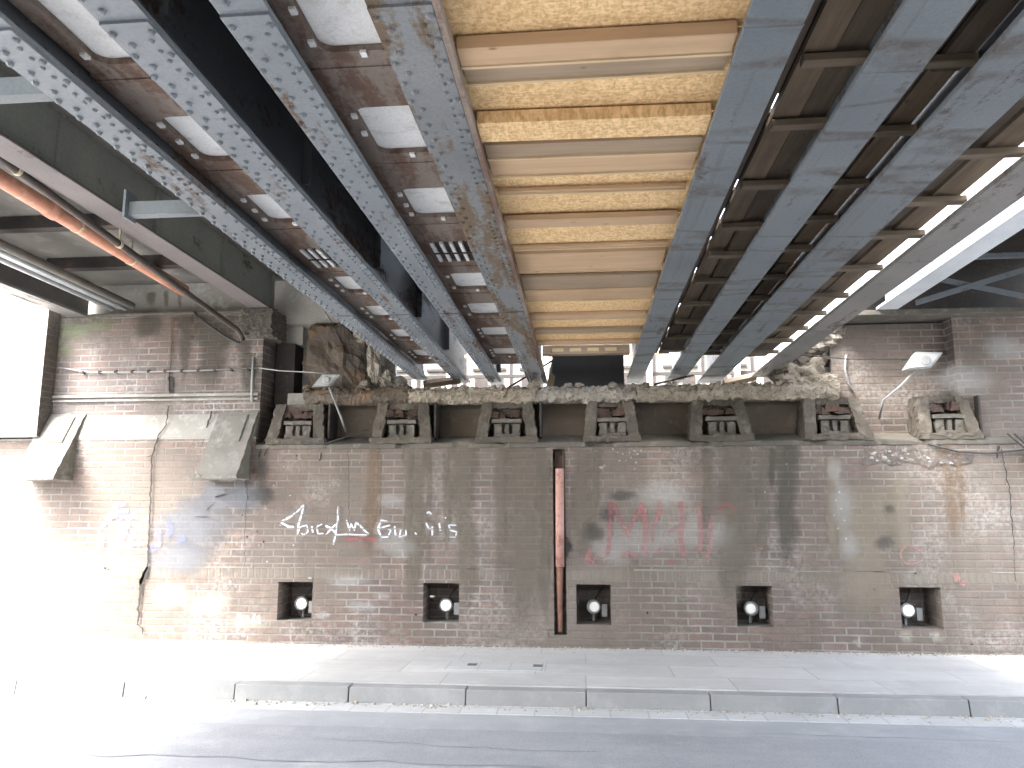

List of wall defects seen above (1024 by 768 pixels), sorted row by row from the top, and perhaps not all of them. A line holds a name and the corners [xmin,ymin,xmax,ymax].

spalling [302,322,847,406]
crack [136,313,173,634]
leakage [703,445,798,583]
leakage [827,457,910,603]
spalling [861,445,974,470]